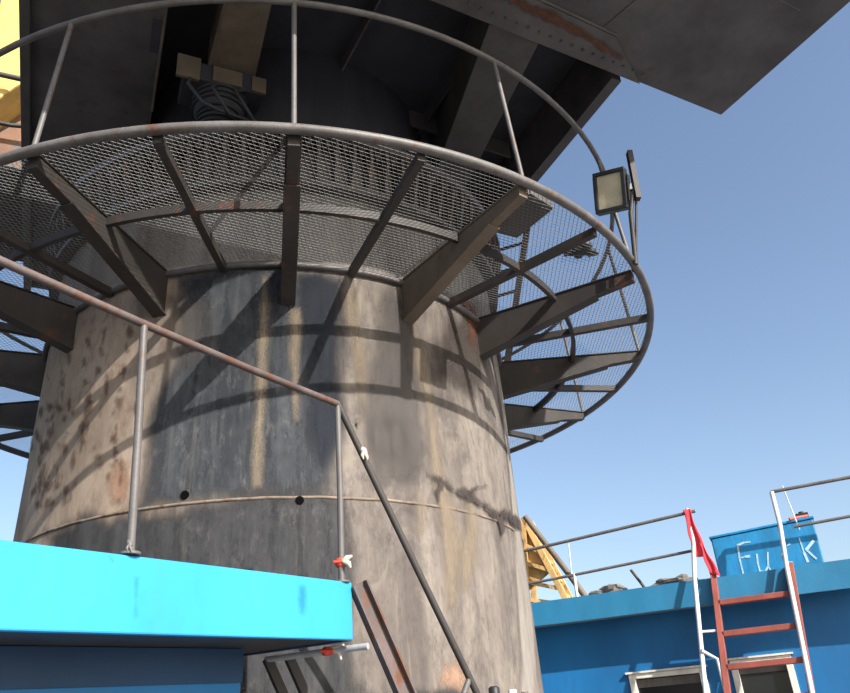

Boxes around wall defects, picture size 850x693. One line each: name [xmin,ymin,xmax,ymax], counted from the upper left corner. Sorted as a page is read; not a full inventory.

corrosion [509,0,621,58]
leakage [52,268,354,587]
leakage [240,642,359,693]